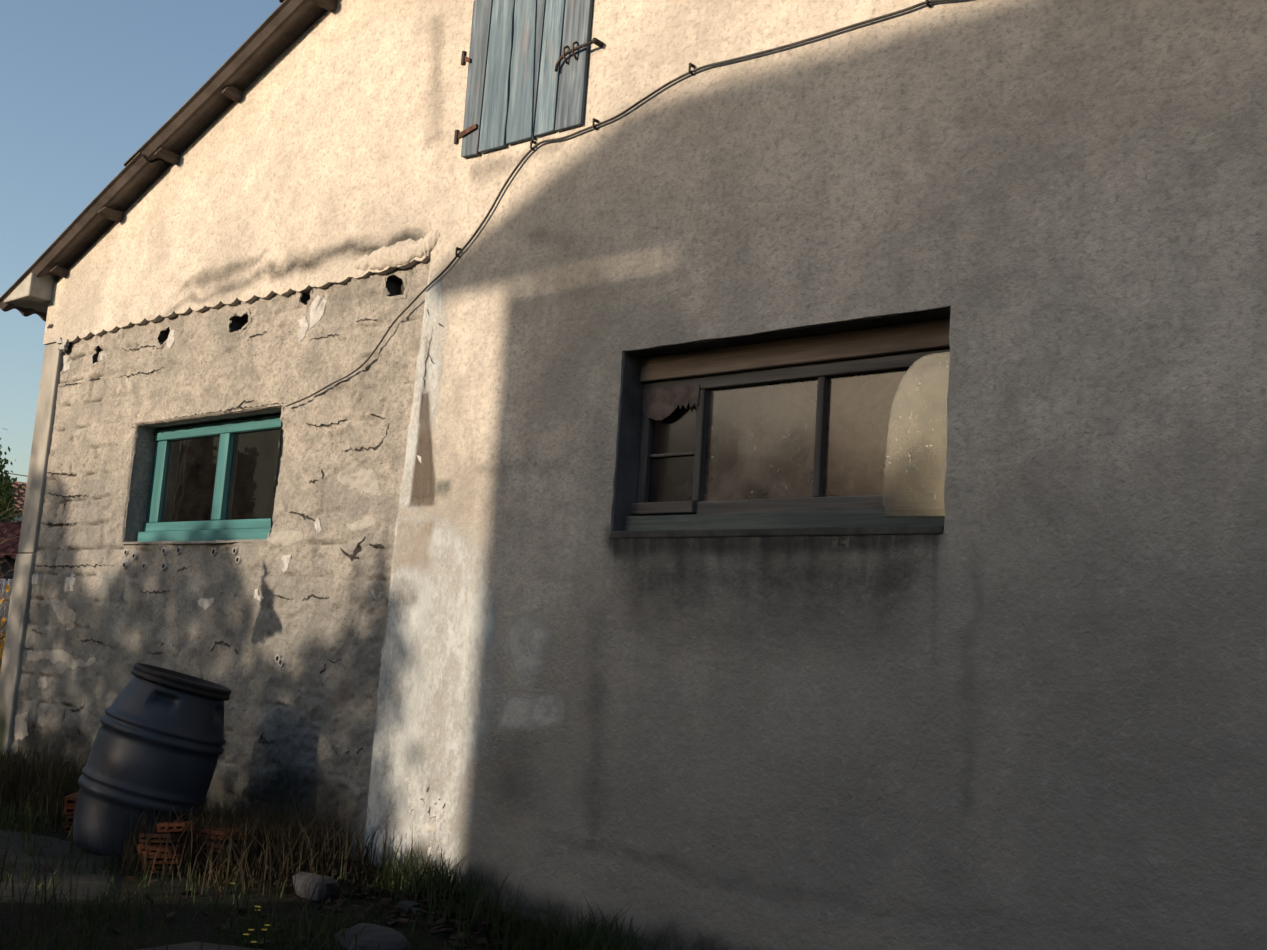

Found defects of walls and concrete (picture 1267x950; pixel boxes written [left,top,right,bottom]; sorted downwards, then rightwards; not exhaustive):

water stain [335,233,413,252]
spalling [382,271,408,300]
spalling [155,324,175,349]
spalling [227,309,251,337]
crack [310,318,376,340]
crack [58,345,163,387]
peeling [399,281,444,506]
crack [41,472,88,526]
water stain [608,532,933,552]
crack [34,562,115,570]
crack [275,593,329,601]
peeling [364,519,565,868]